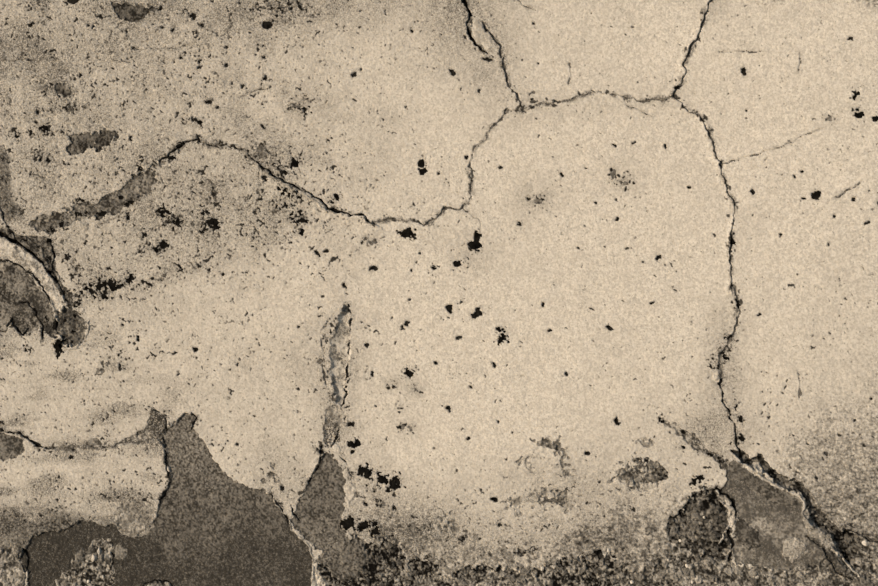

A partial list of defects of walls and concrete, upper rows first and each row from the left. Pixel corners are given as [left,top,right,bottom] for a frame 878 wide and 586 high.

crack [462,0,576,129]
crack [612,0,713,115]
crack [159,137,474,226]
peeling [0,143,186,351]
hole [317,304,363,406]
crack [693,113,878,580]
peeling [0,412,878,586]